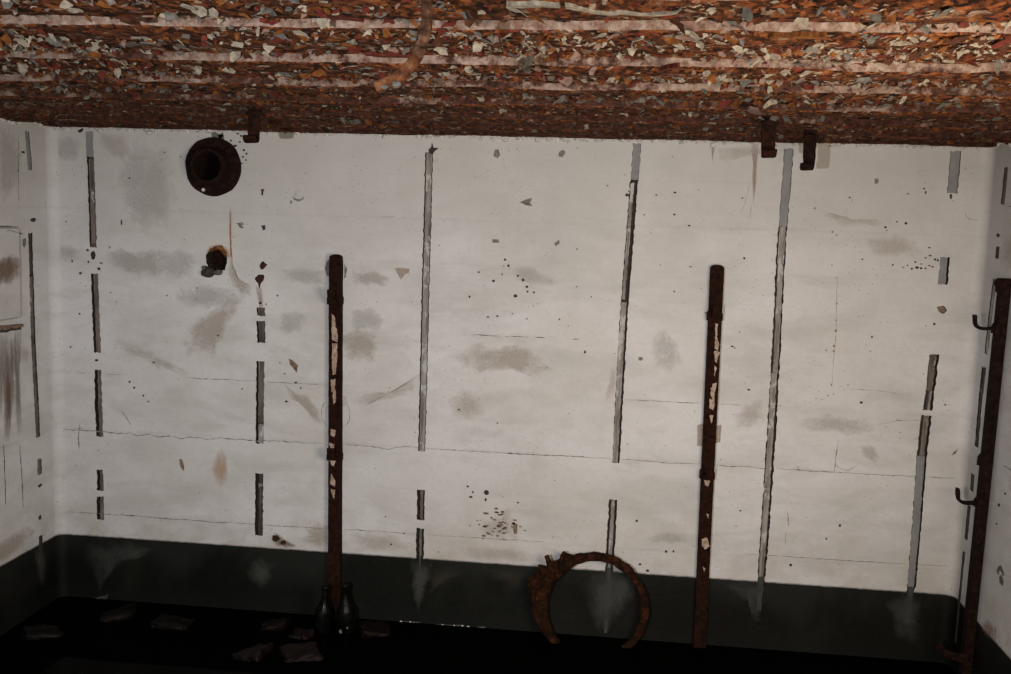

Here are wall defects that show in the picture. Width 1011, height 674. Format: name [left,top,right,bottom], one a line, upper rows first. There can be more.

peeling [0,0,1011,164]